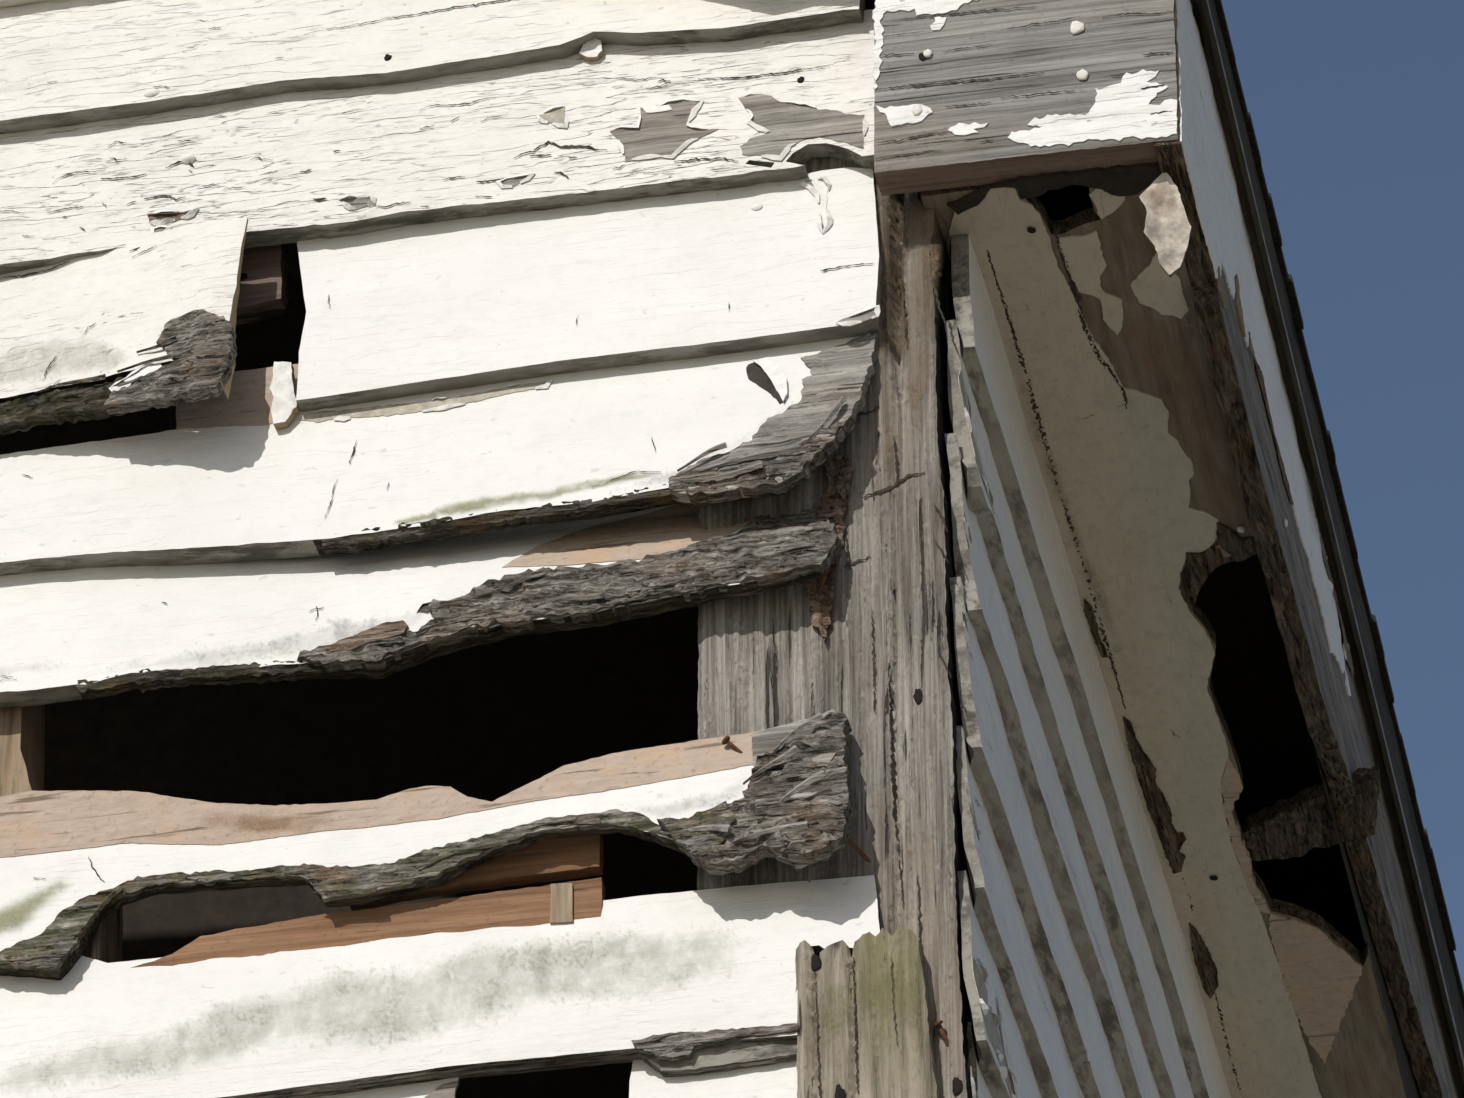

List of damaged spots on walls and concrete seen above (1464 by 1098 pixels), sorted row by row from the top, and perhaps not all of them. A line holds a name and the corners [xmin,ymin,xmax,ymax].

peeling [610,97,718,162]
peeling [739,94,868,161]
hole [1038,185,1093,221]
spalling [234,273,306,371]
spalling [0,406,177,455]
peeling [1253,354,1294,505]
peeling [1084,598,1109,658]
spalling [44,606,699,806]
hole [1196,554,1421,1098]
spalling [122,833,698,961]
peeling [971,956,1022,1098]
spalling [456,1062,633,1098]